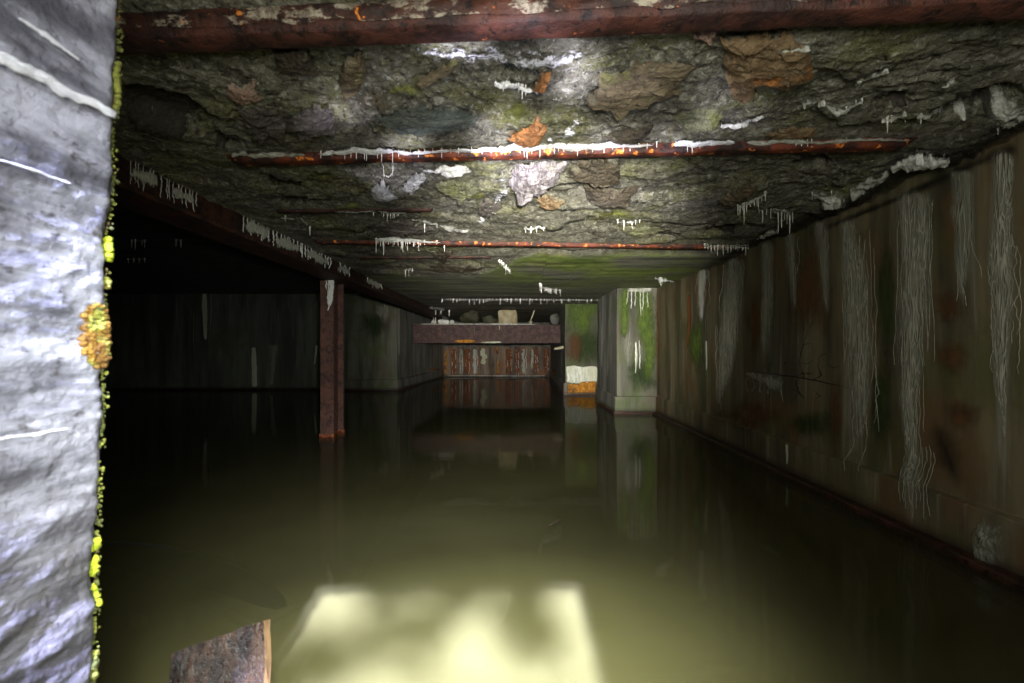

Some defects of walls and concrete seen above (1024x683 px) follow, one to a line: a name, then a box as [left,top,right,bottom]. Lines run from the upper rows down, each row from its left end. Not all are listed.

damp [130,161,198,212]
damp [320,120,658,178]
corrosion [429,340,475,374]
damp [425,283,612,384]
damp [624,277,674,376]
damp [673,84,1024,518]